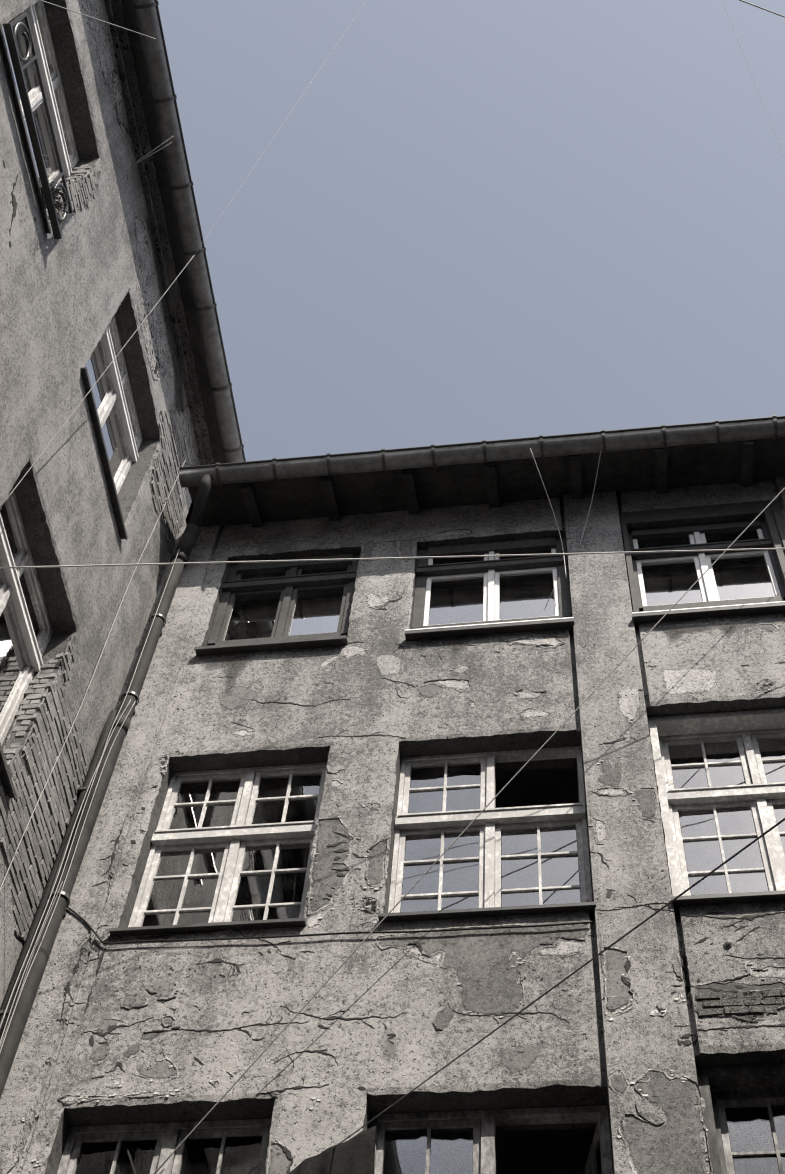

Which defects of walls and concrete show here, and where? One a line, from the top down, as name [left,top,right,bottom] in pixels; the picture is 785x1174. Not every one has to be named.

crack [45,784,407,1095]
flaking render [301,816,785,1033]
crack [448,1002,569,1024]
flaking render [677,1032,698,1046]
flaking render [497,1042,543,1075]
flaking render [608,1068,713,1174]
flaking render [265,1139,297,1174]